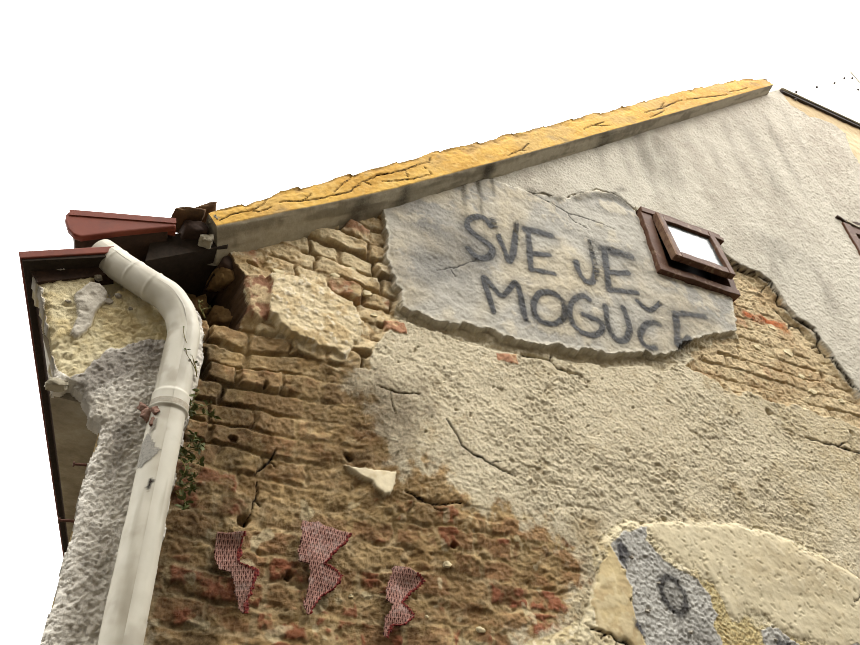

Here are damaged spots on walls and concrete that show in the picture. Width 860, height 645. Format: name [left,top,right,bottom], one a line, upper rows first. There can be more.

spalling [171,202,217,233]
crack [287,158,431,202]
spalling [32,269,167,392]
spalling [686,255,860,428]
peeling [137,418,160,468]
spalling [143,210,582,645]
crack [446,418,513,476]
peeling [591,518,860,645]